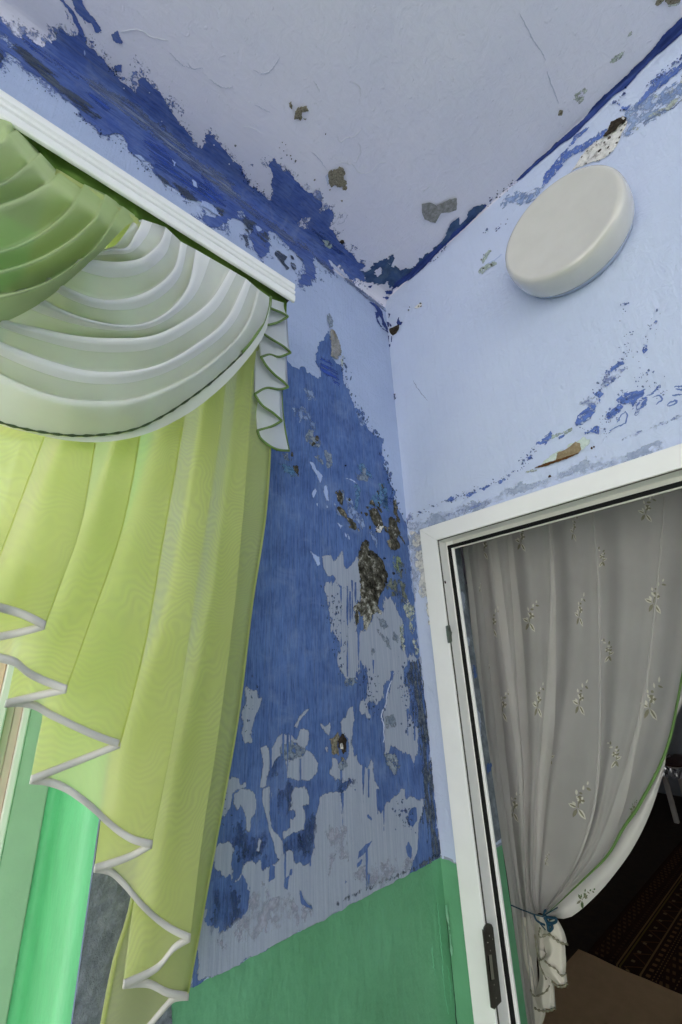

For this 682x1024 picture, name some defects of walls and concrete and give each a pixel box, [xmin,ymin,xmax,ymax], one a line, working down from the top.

peeling [0,0,682,347]
peeling [192,313,440,988]
leakage [337,501,489,906]
leakage [508,482,537,494]
peeling [446,309,682,503]
leakage [628,441,661,460]